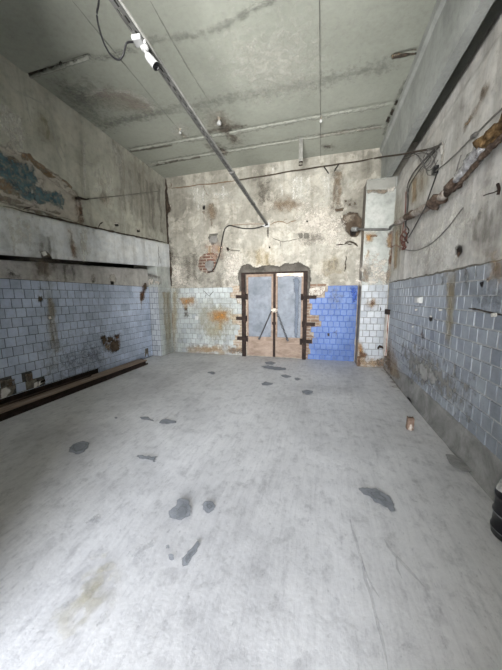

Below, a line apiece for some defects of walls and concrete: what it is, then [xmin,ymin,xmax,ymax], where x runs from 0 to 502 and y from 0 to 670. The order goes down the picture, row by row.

peeling [0,142,80,222]
flaking render [297,200,362,248]
spalling [100,334,120,353]
peeling [197,252,247,350]
peeling [296,284,326,359]
peeling [0,373,45,399]